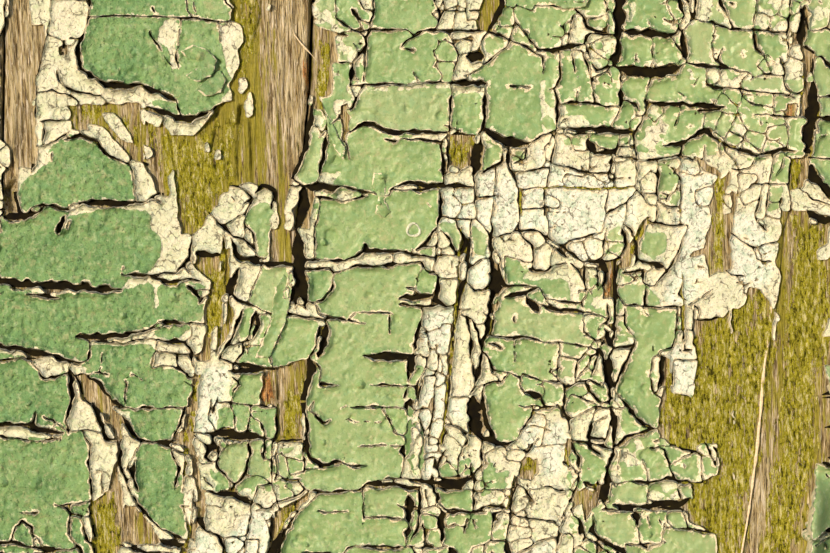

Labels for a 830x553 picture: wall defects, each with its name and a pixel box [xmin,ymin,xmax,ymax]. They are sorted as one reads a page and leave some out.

crack [0,0,232,234]
crack [0,277,122,298]
crack [122,239,220,303]
peeling [0,0,510,553]
peeling [351,0,830,553]
crack [0,320,205,553]